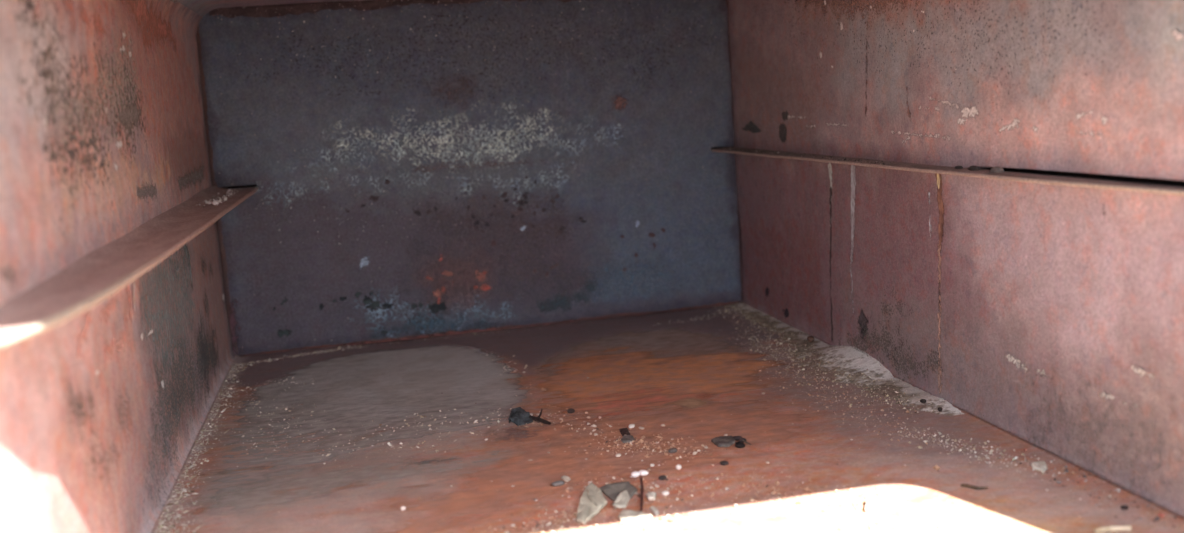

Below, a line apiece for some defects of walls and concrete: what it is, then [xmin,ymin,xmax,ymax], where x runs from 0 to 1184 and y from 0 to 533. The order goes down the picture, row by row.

damp [256,101,623,209]
damp [115,292,220,518]
rust [393,347,809,533]